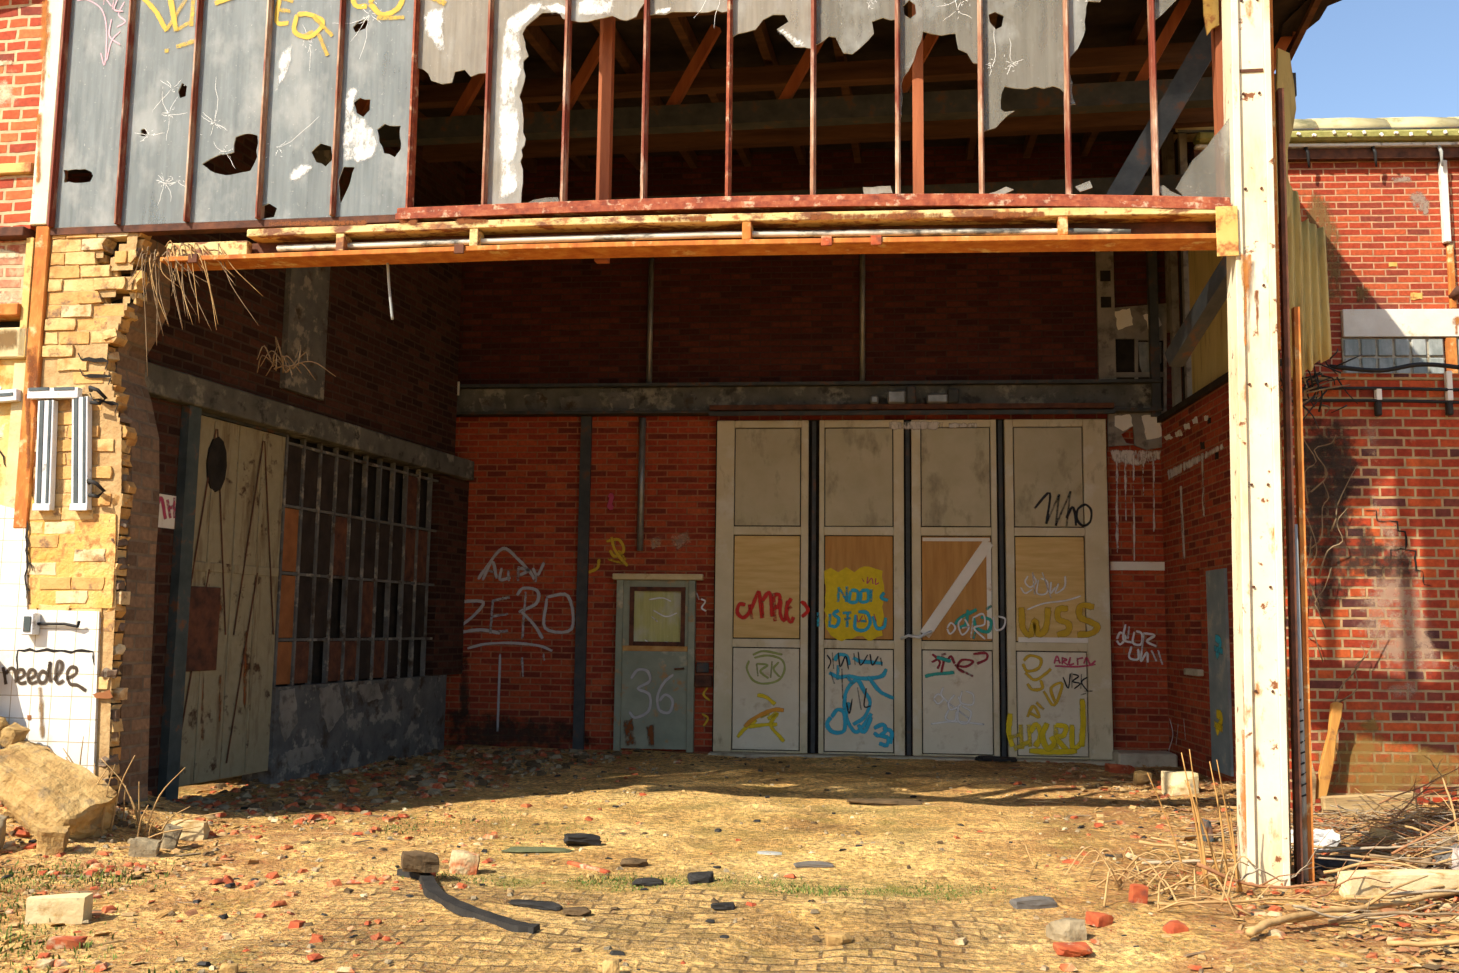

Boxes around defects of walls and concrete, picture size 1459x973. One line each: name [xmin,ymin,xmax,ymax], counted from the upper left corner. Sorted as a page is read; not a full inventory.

corrosion [1240,0,1281,351]